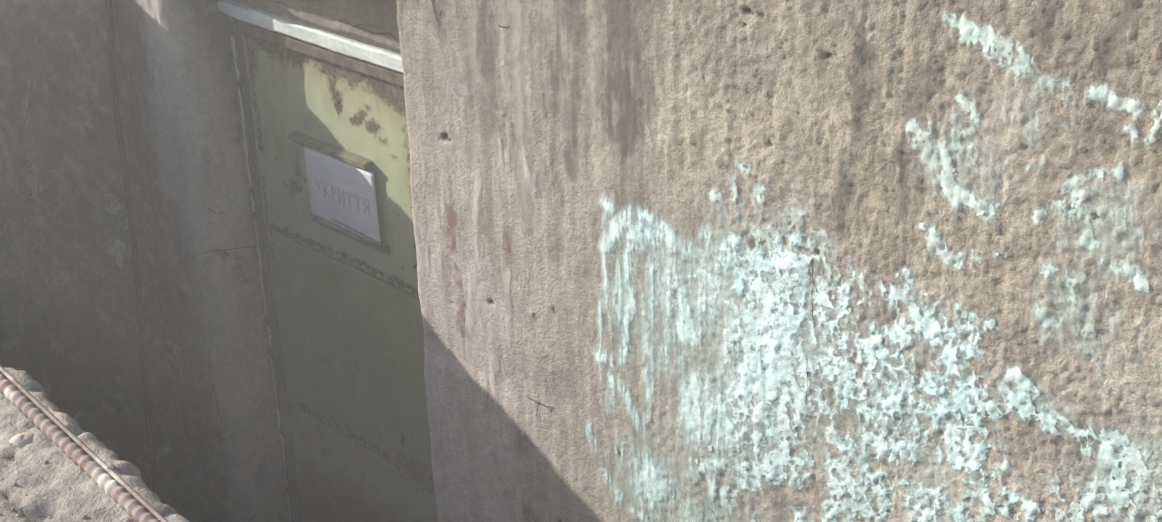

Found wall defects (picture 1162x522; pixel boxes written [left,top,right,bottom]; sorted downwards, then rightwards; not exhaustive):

damp [551,0,637,172]
damp [851,15,866,141]
peeling [943,13,1162,145]
peeling [906,94,1011,222]
peeling [593,162,1162,522]